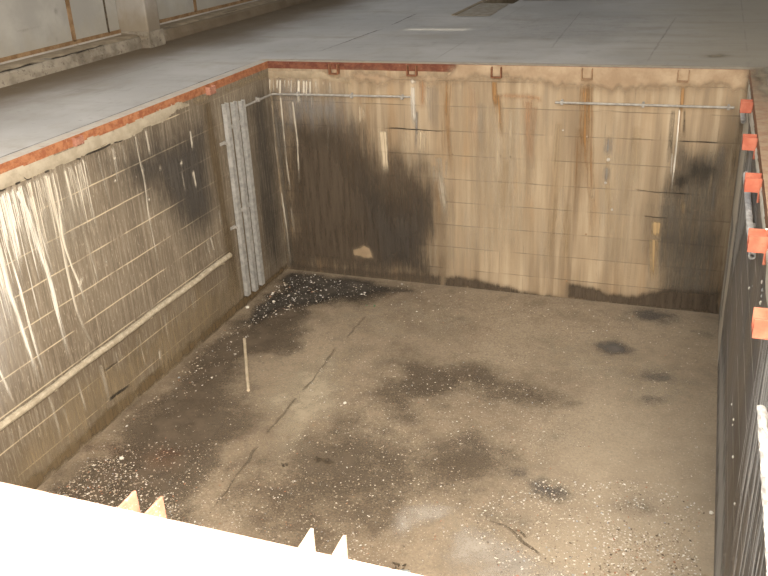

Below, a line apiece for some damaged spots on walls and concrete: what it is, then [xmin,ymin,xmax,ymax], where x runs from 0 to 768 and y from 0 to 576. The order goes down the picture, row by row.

efflorescence [0,160,93,361]
leakage [18,79,548,544]
crack [267,354,332,432]
leakage [568,85,753,361]
efflorescence [733,341,768,576]